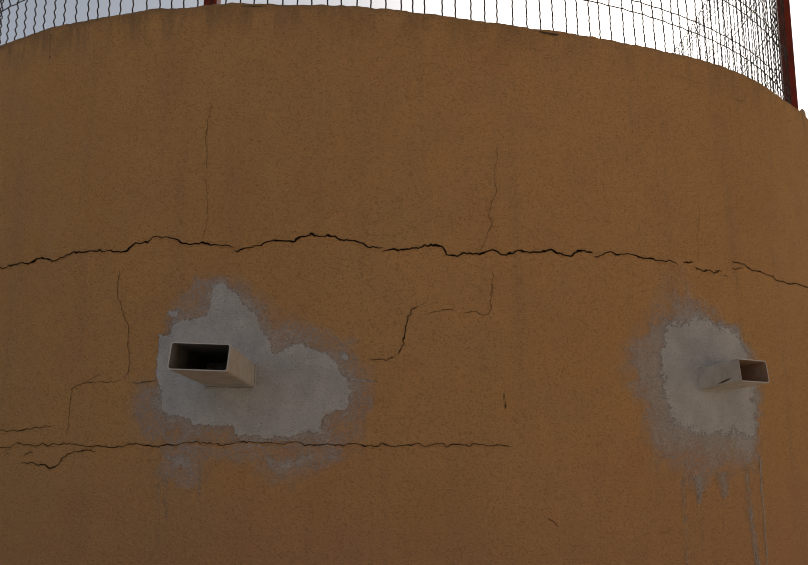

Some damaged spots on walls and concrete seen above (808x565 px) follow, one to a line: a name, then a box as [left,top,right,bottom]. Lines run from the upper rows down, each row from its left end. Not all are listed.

crack [0,108,808,469]